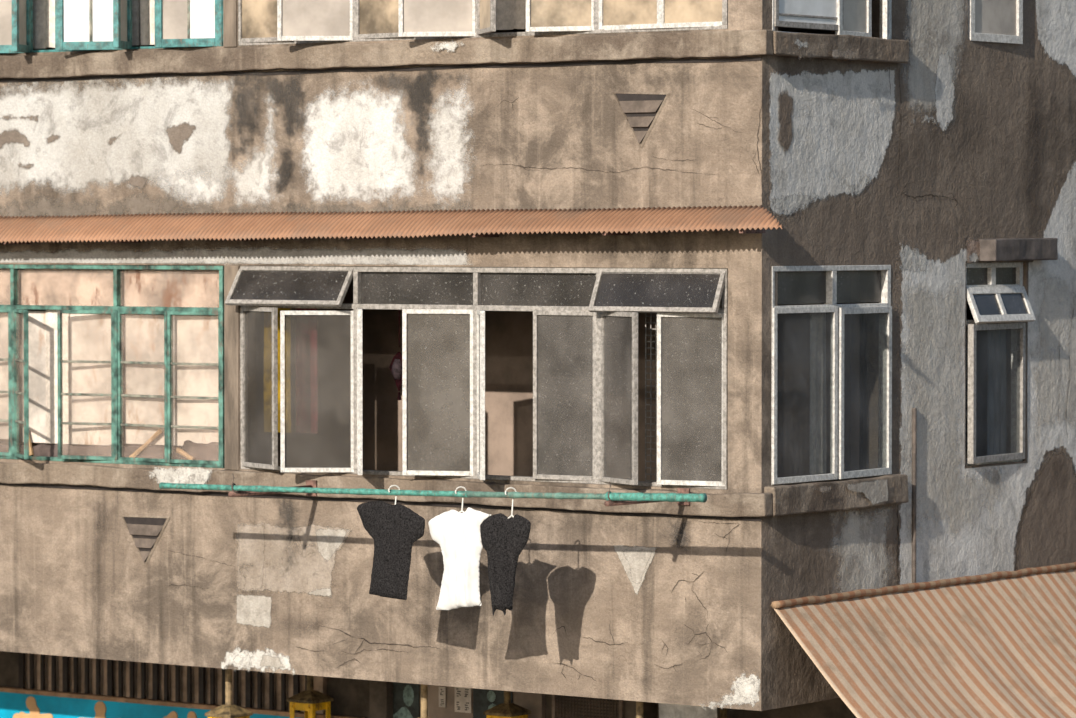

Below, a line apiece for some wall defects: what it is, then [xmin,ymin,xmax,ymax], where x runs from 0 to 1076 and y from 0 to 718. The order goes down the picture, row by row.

peeling [1036,0,1076,76]
peeling [0,77,279,205]
leakage [235,77,305,154]
leakage [277,152,292,192]
leakage [378,68,462,150]
crack [889,68,958,209]
peeling [834,162,1076,592]
spalling [150,466,212,484]
crack [654,573,726,671]
spalling [221,647,295,675]
spalling [701,674,760,709]